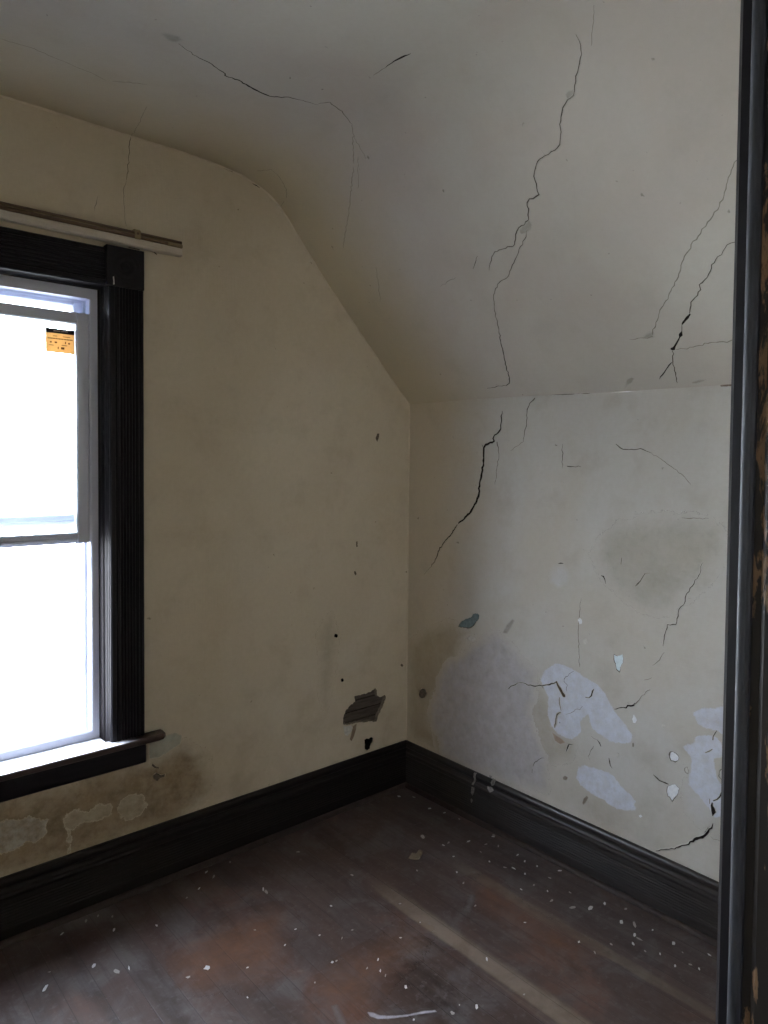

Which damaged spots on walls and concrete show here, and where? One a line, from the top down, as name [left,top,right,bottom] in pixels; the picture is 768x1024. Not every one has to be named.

crack [182,46,364,248]
crack [426,15,613,572]
crack [629,160,737,383]
water stain [0,737,215,878]
flaking render [343,689,386,736]
peeling [419,613,637,796]
peeling [575,765,643,818]
crack [614,563,703,710]
crack [655,792,721,852]
peeling [667,705,723,830]